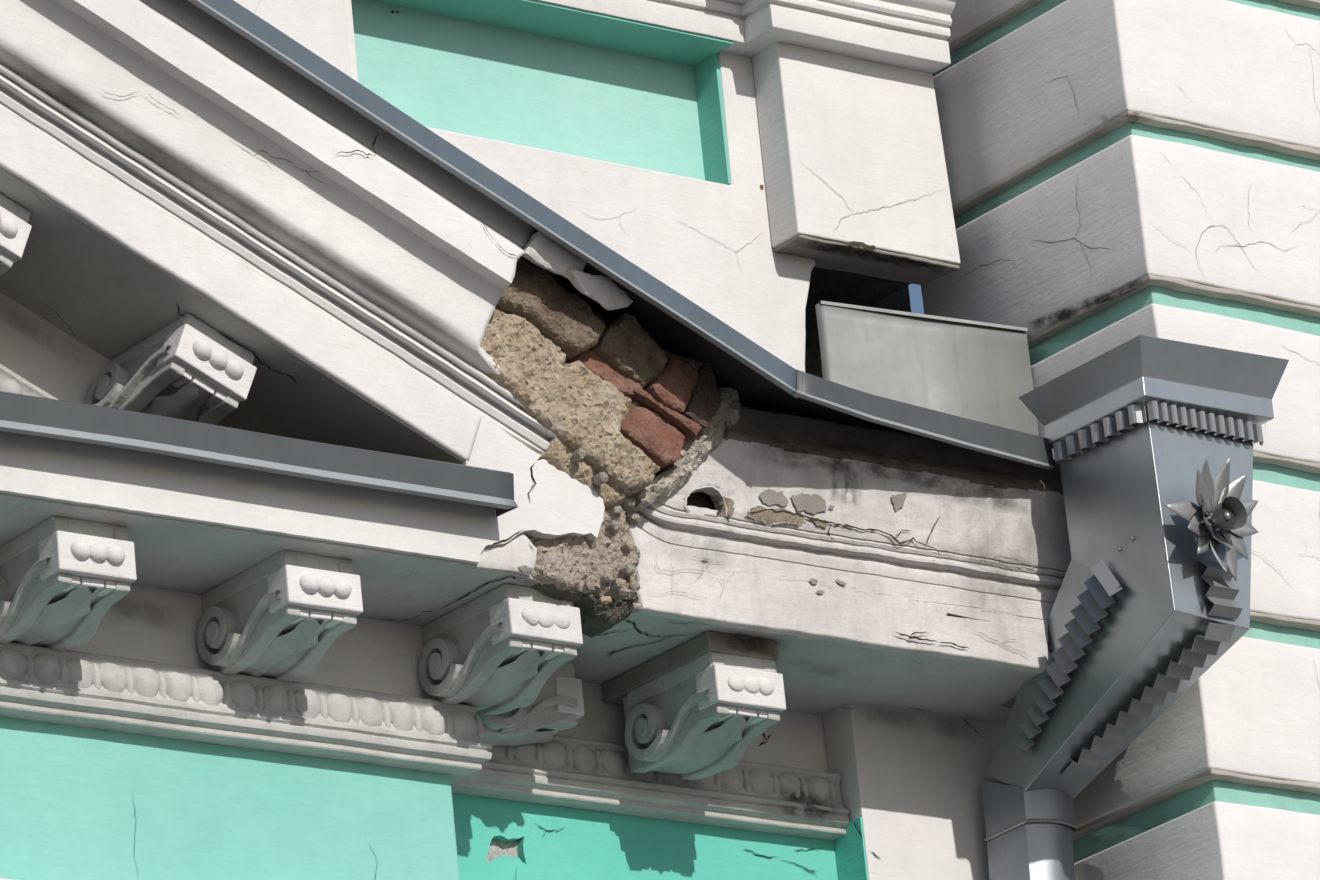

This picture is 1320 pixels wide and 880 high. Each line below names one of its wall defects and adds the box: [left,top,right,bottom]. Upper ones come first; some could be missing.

crack [230,134,378,188]
crack [799,159,944,232]
crack [964,177,1115,276]
crack [1157,158,1319,277]
spalling [470,231,783,638]
peeling [710,489,835,528]
peeling [892,493,907,511]
crack [746,509,1039,572]
crack [598,549,724,657]
crack [896,630,1030,657]
spalling [485,839,518,862]
crack [745,847,824,876]